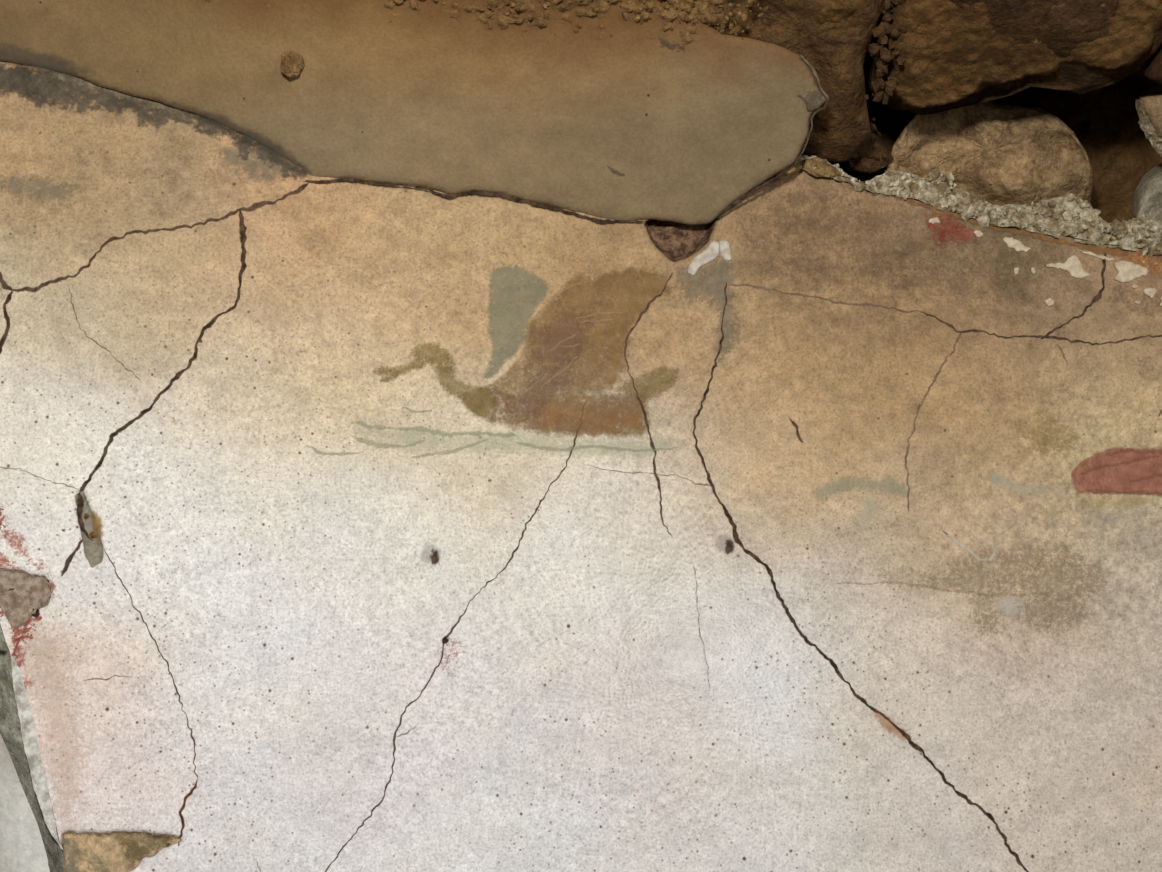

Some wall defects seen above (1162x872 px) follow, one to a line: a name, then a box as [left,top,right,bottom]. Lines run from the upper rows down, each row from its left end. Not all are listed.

crack [0,178,644,492]
crack [715,165,794,220]
spalling [0,530,55,686]
crack [61,539,198,846]
crack [325,400,587,872]
crack [600,246,1162,872]
spalling [60,831,181,872]